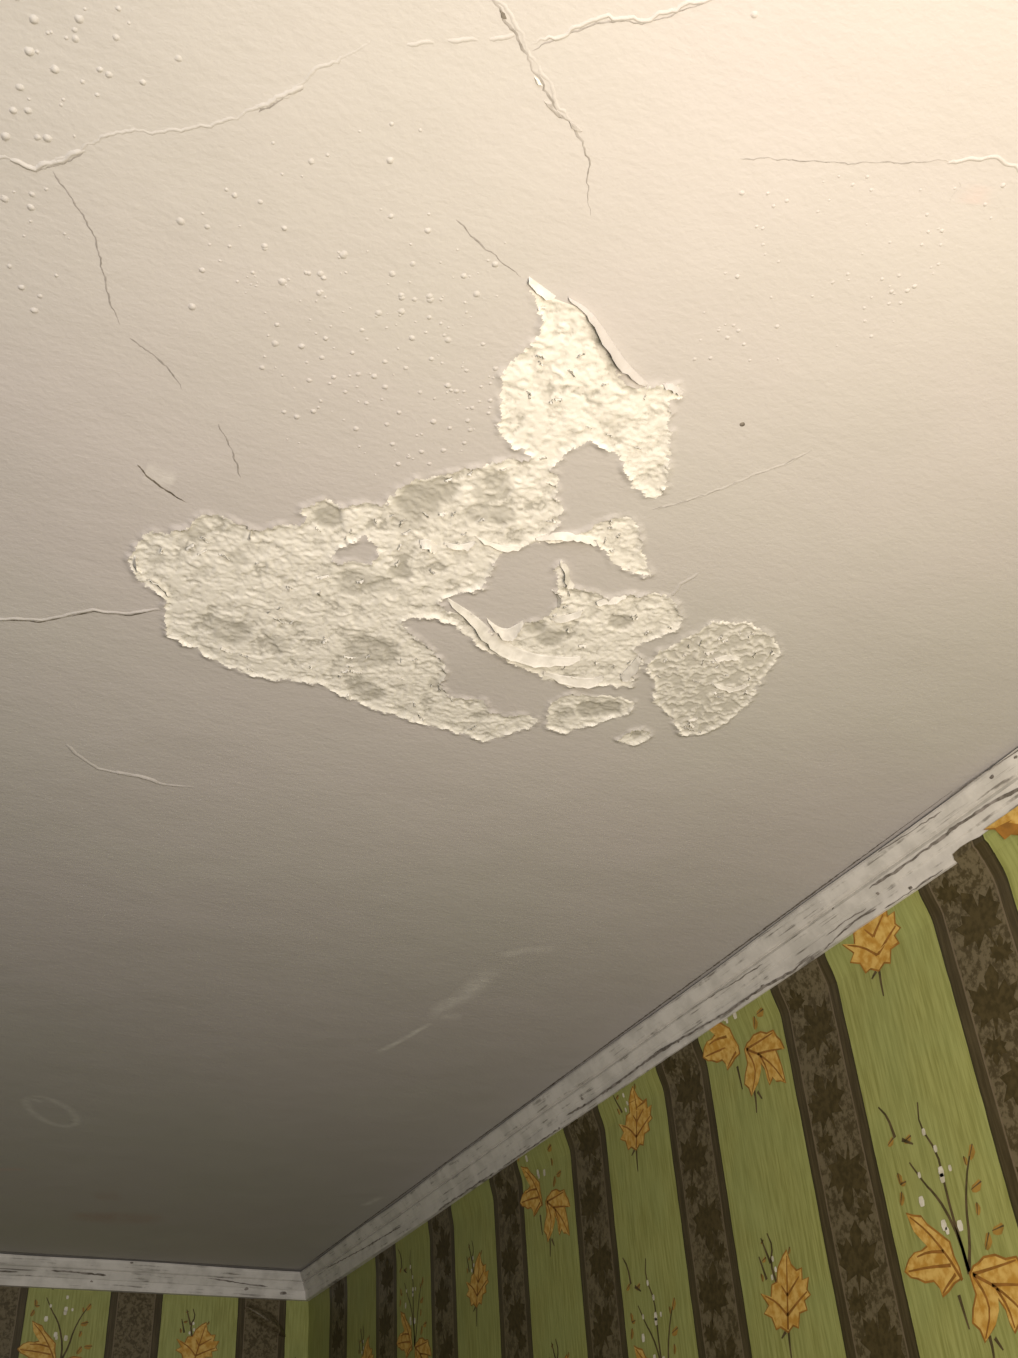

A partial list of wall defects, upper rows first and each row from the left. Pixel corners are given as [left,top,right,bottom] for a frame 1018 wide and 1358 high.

crack [407,0,712,215]
crack [745,154,1018,173]
crack [0,38,371,389]
crack [457,220,519,276]
crack [219,426,241,477]
crack [138,465,185,502]
peeling [128,277,781,742]
crack [0,608,160,623]
flaking render [617,729,651,746]